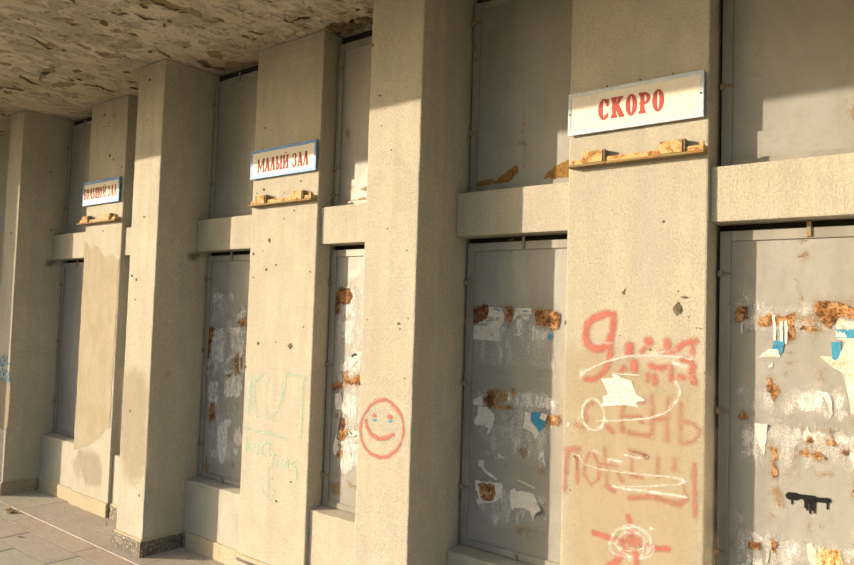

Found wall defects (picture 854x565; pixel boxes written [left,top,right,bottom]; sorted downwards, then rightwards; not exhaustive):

peeling [45,11,158,58]
peeling [135,0,225,29]
peeling [324,7,373,36]
peeling [176,40,259,72]
crack [8,73,51,98]
peeling [37,64,97,98]
peeling [74,241,119,450]
leakage [573,361,692,565]